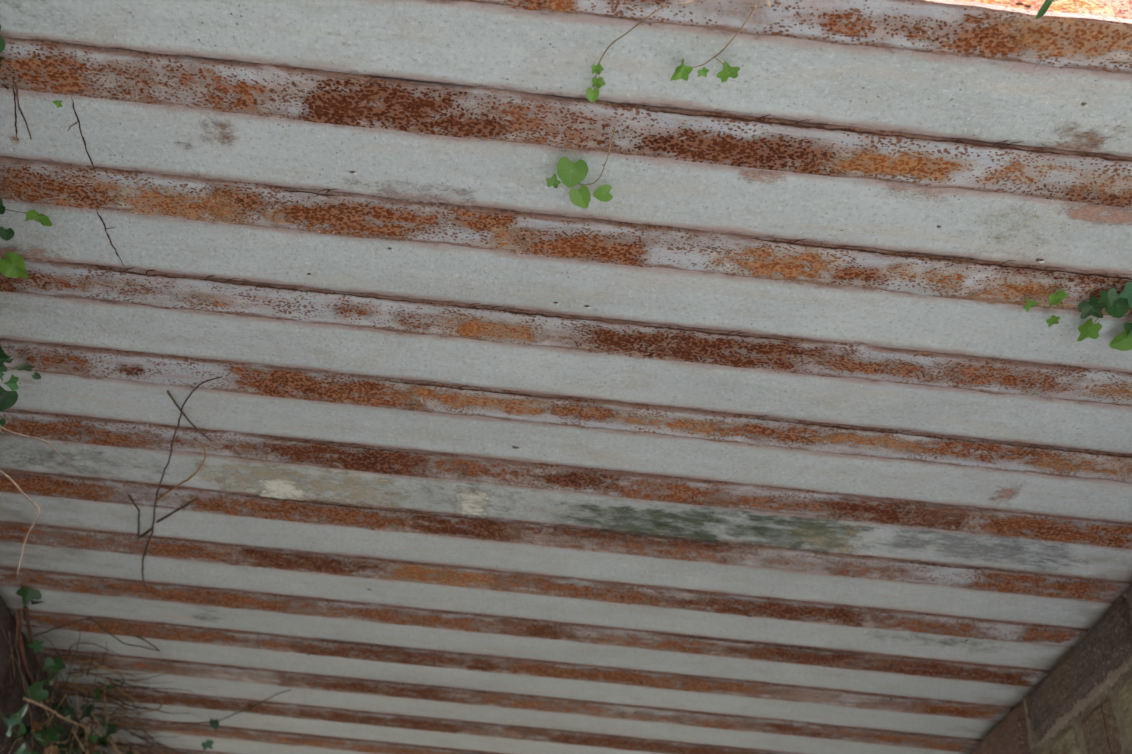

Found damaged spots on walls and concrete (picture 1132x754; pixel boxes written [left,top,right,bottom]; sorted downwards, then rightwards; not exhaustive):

rust [0,47,1132,208]
rust [0,162,655,267]
rust [334,300,1132,402]
damp [197,460,408,511]
damp [442,484,491,517]
rust [39,651,974,754]
rust [14,613,1011,720]
rust [0,572,1046,687]
rust [0,525,1084,643]
rust [2,417,1132,549]
damp [561,503,864,554]
damp [881,530,1086,570]